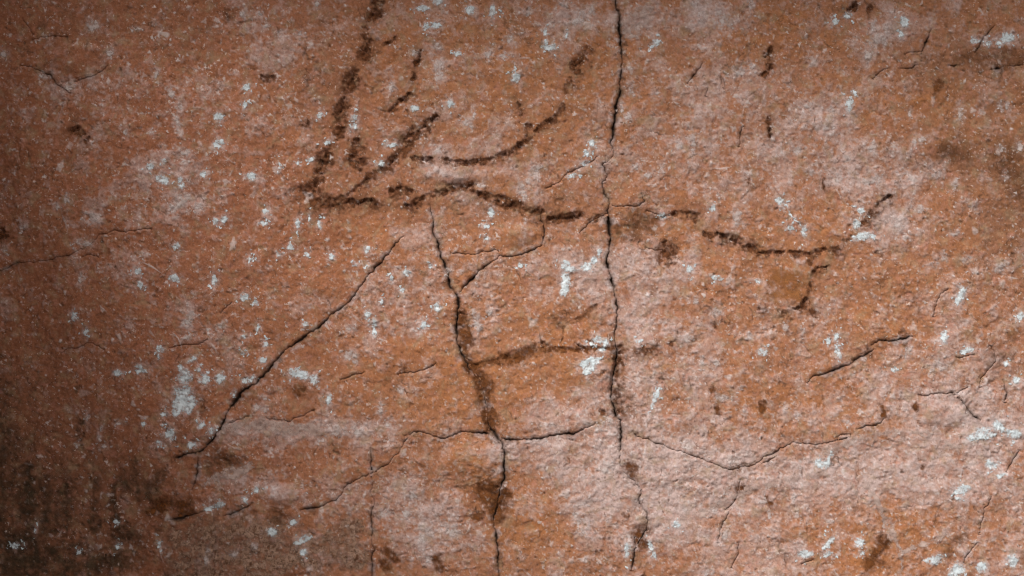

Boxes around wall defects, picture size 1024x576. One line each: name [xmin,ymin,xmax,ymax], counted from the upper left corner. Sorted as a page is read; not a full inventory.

crack [872,28,934,80]
crack [167,235,405,523]
crack [300,0,886,576]
crack [806,334,914,384]